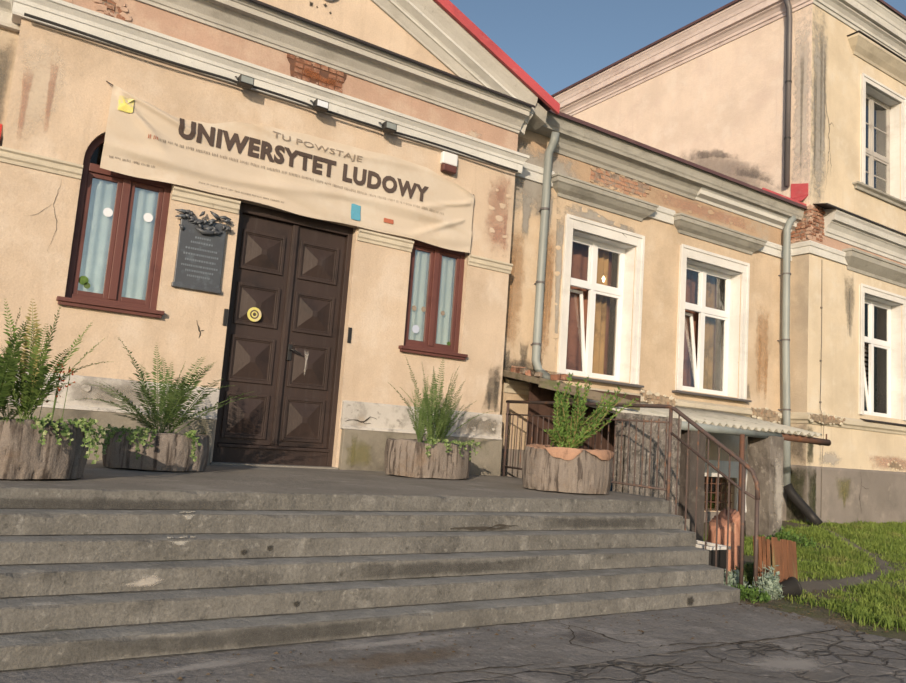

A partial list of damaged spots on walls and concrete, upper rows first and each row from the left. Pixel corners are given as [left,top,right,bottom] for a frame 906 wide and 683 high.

spalling [92,0,133,22]
water stain [0,65,8,113]
spalling [287,53,347,93]
water stain [814,63,826,156]
crack [817,35,833,185]
spalling [590,166,651,197]
spalling [791,203,825,243]
water stain [486,348,542,408]
spalling [751,407,782,423]
spalling [809,412,846,426]
crack [673,628,866,668]